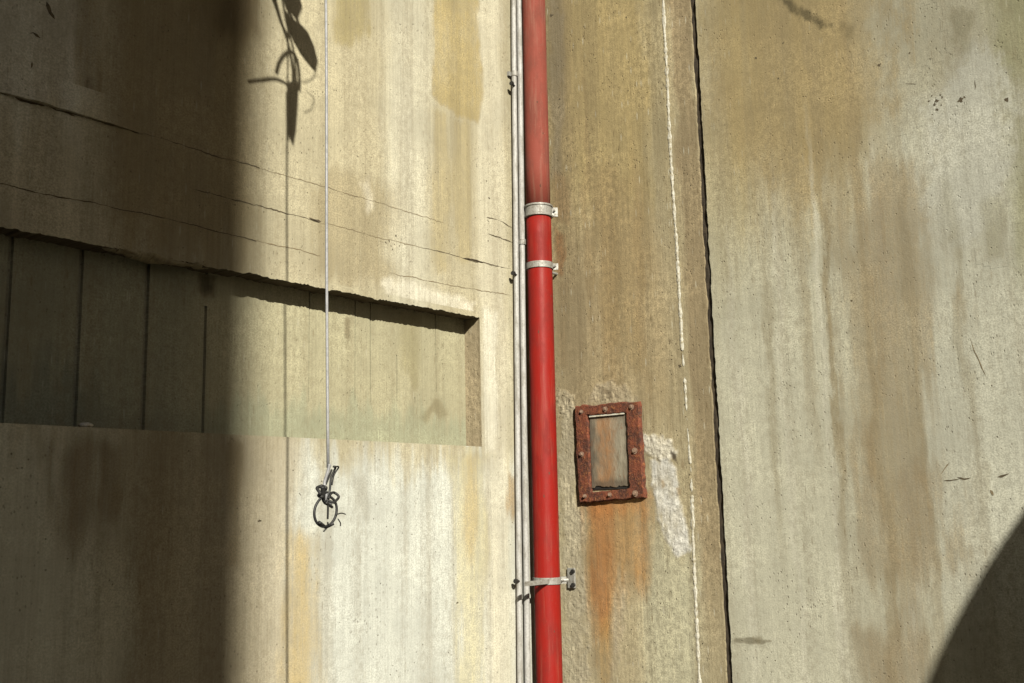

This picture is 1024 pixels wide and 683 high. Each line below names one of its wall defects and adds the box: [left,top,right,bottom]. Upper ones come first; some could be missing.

crack [0,183,319,256]
crack [1,93,440,222]
water stain [303,0,502,683]
water stain [662,0,702,683]
corrosion [576,480,661,683]